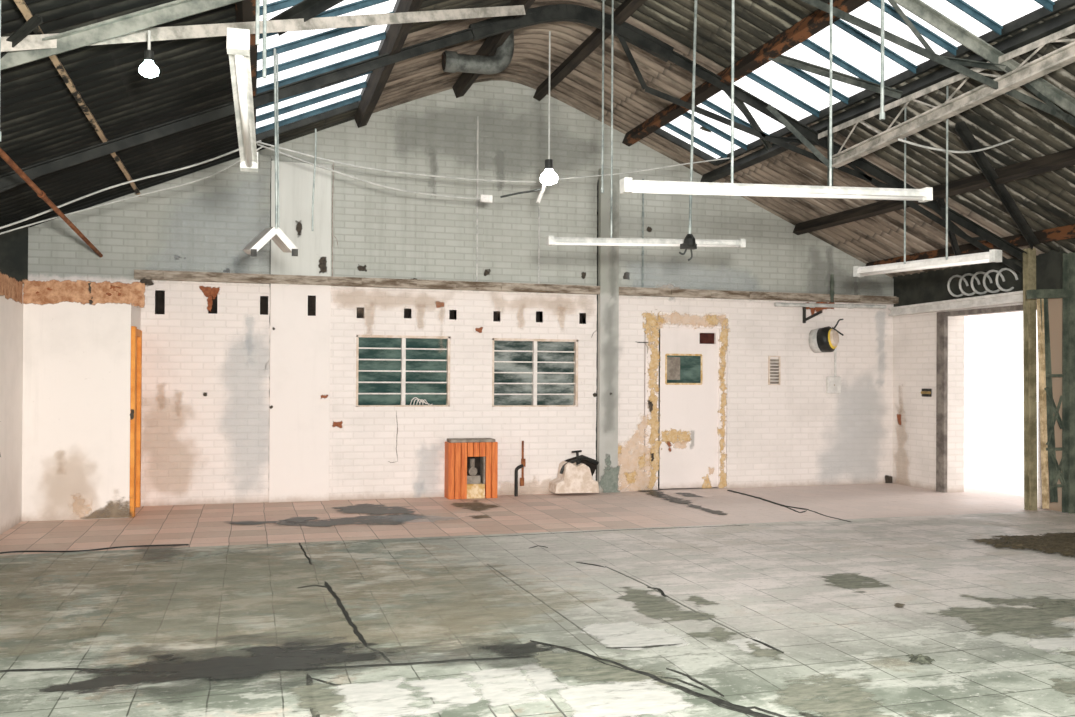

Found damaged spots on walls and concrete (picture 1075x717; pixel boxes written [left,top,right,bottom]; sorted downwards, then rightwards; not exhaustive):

flaking render [0,272,165,314]
flaking render [618,311,730,491]
crack [125,525,787,717]
water stain [273,637,362,657]
crack [0,667,172,675]